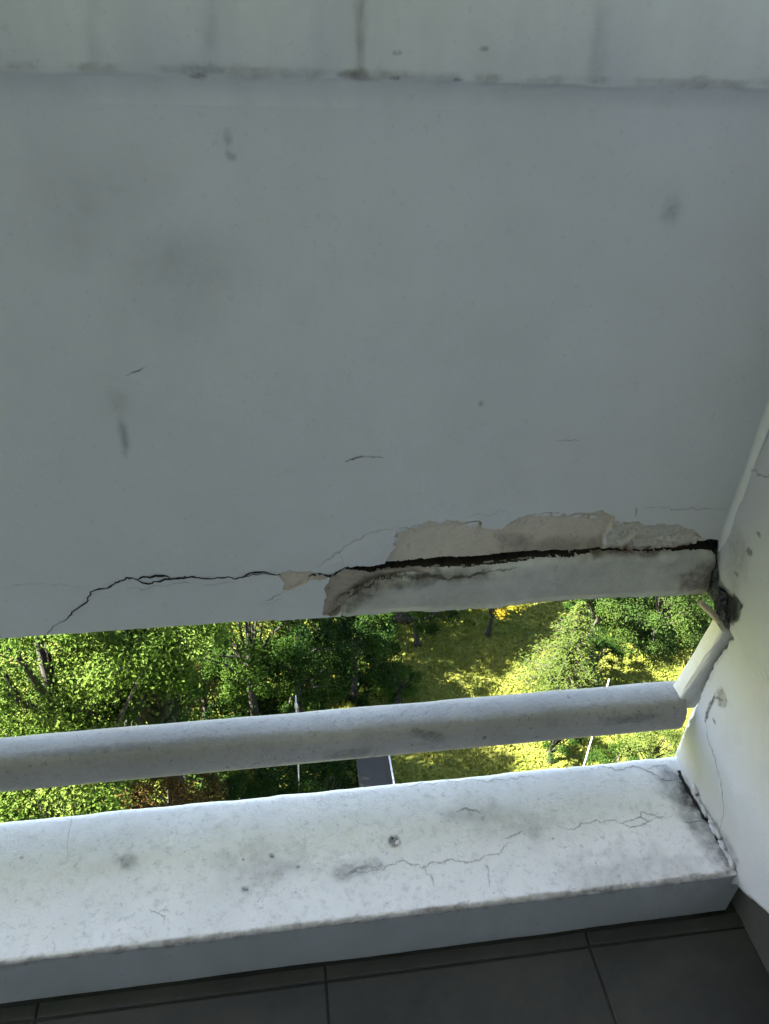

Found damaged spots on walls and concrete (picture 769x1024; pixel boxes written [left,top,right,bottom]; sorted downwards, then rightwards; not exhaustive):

crack [47,571,280,635]
flaking render [279,510,615,617]
leakage [701,539,737,621]